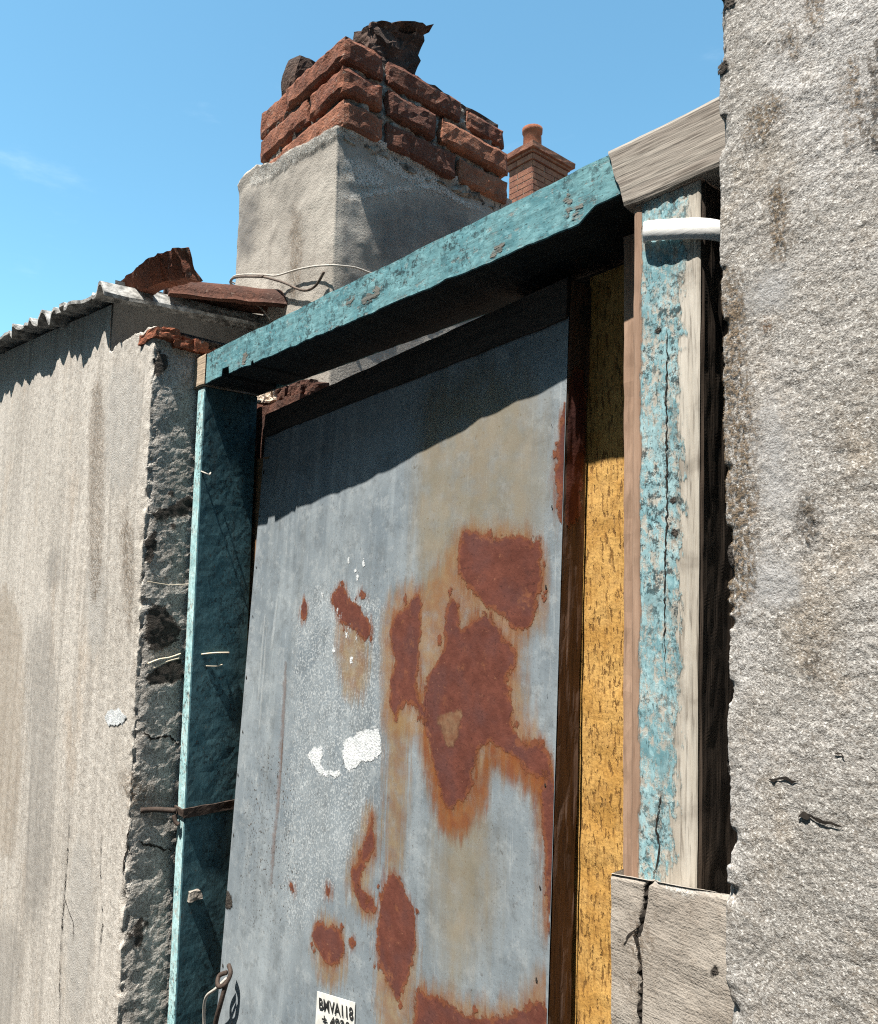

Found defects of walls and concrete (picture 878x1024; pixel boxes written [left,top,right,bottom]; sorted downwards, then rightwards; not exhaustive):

spalling [138,327,216,377]
spalling [144,604,184,685]
spalling [144,490,193,563]
rust [331,580,372,641]
rust [383,529,554,932]
crack [662,323,670,674]
rust [350,814,547,1024]
crack [624,796,661,1024]